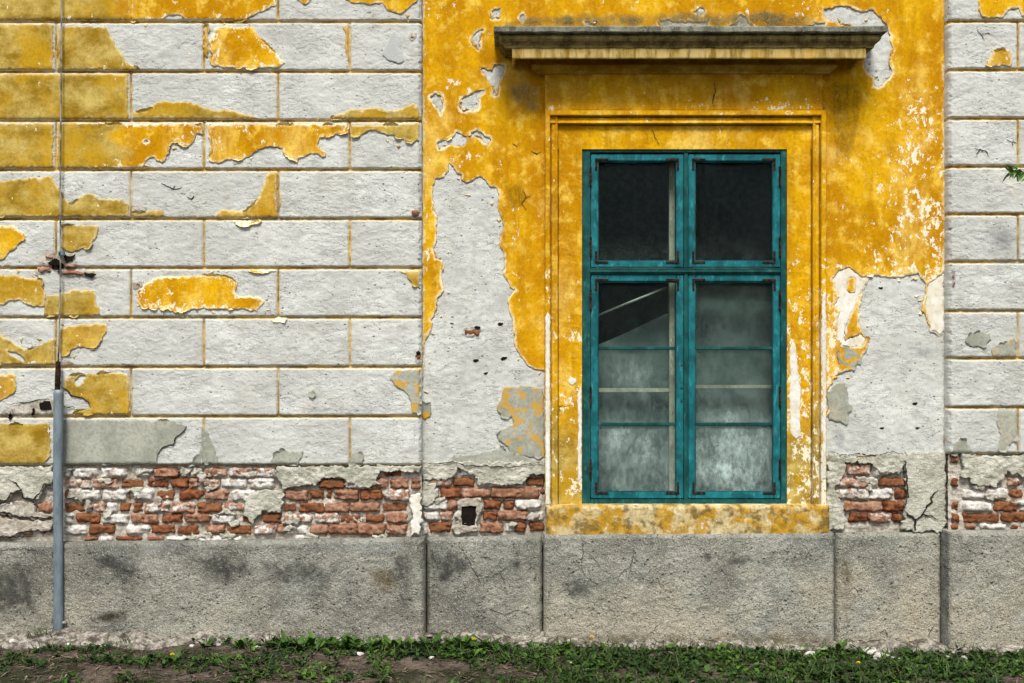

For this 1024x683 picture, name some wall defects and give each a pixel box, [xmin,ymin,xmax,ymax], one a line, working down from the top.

peeling [807,6,894,88]
spalling [0,0,550,543]
crack [831,451,938,530]
peeling [822,267,1024,539]